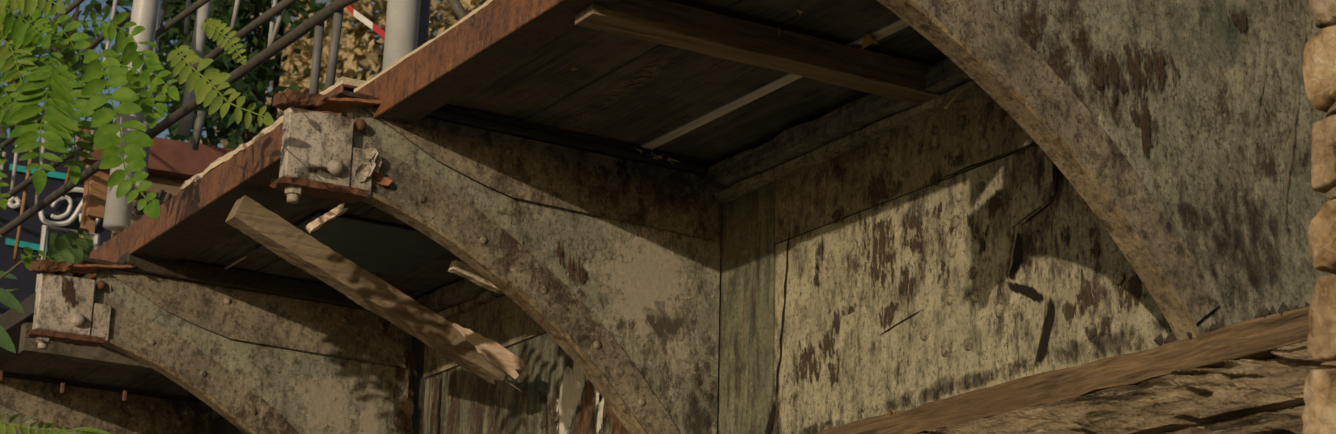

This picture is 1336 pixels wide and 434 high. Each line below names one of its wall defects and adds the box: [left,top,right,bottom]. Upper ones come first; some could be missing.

crack [940,142,1057,365]
rust [61,273,80,308]
crack [765,229,790,434]
damp [1056,329,1140,360]
damp [424,377,451,433]
peeling [555,362,604,434]
damp [803,412,859,434]
damp [886,360,1032,411]